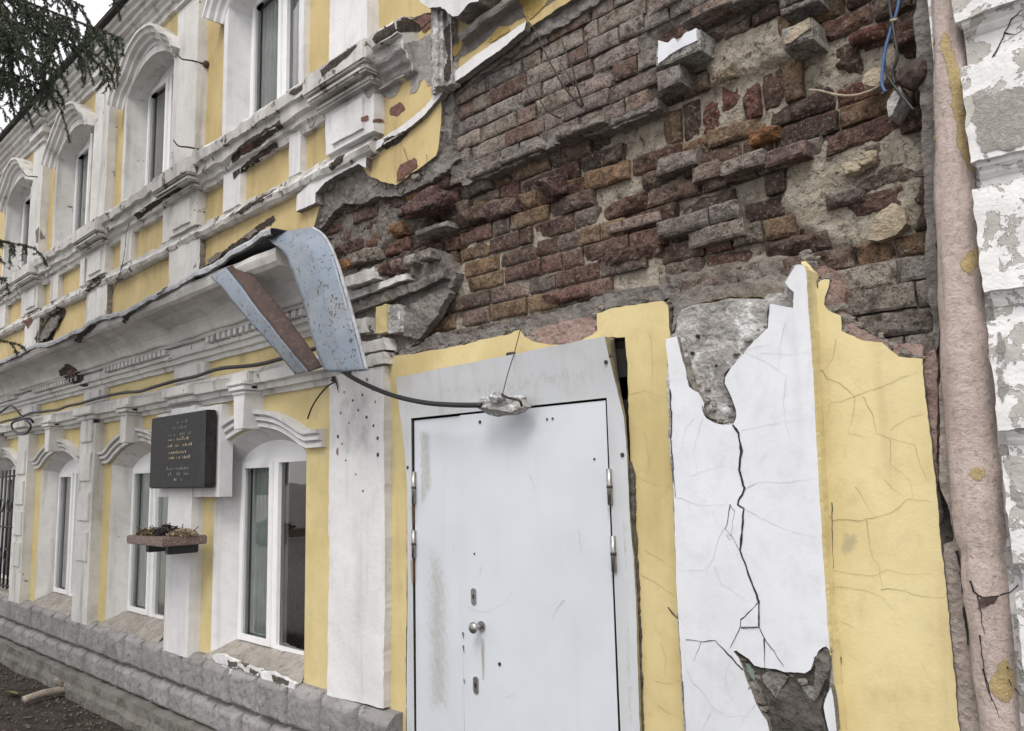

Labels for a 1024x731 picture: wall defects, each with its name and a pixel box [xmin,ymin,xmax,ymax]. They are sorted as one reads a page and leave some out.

peeling [198,215,275,270]
peeling [23,306,67,343]
spalling [58,364,88,387]
spalling [316,0,1024,731]
crack [627,323,1020,731]
peeling [212,653,299,689]